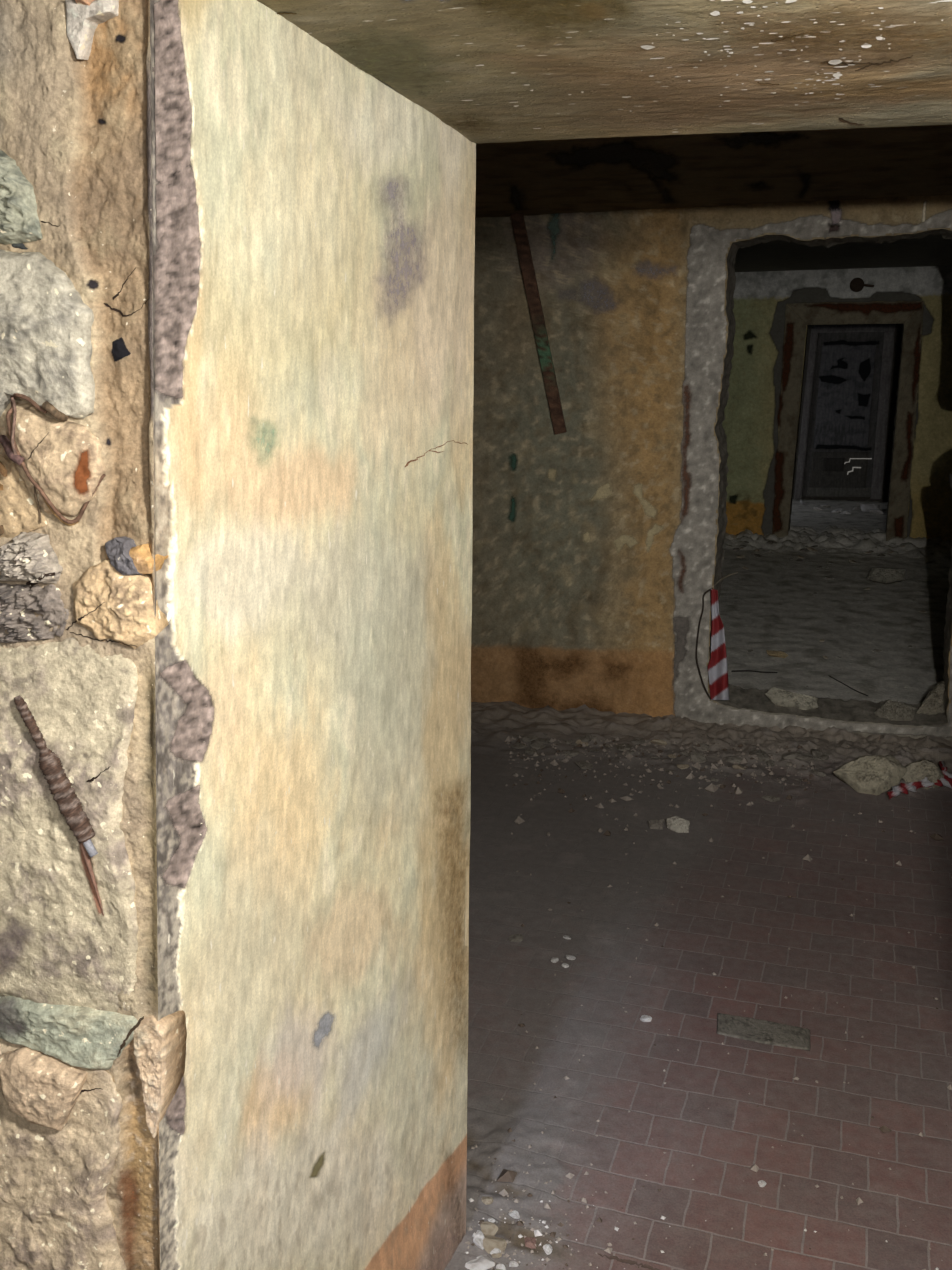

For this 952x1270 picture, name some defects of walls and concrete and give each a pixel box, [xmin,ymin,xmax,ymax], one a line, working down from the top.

flaking render [614,209,952,738]
flaking render [160,660,214,762]
flaking render [162,785,207,889]
crack [597,1253,660,1270]